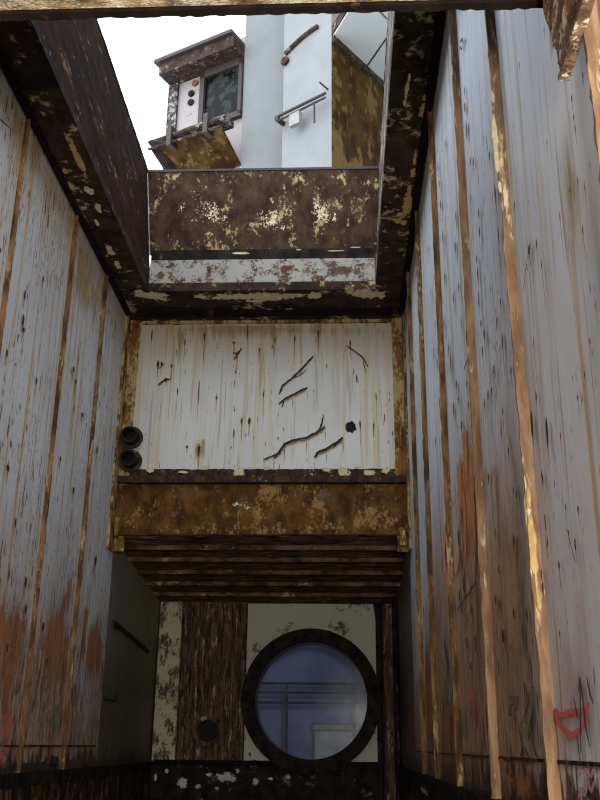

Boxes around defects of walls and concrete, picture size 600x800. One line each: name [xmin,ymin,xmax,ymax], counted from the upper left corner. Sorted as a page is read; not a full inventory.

peeling [63,132,88,176]
peeling [84,186,102,226]
peeling [192,202,228,223]
peeling [251,197,295,230]
peeling [313,199,337,234]
peeling [394,150,417,225]
crack [279,356,313,407]
corrosion [483,298,512,420]
crack [263,415,344,468]
corrosion [0,576,27,712]
corrosion [41,582,72,698]
corrosion [82,608,102,680]